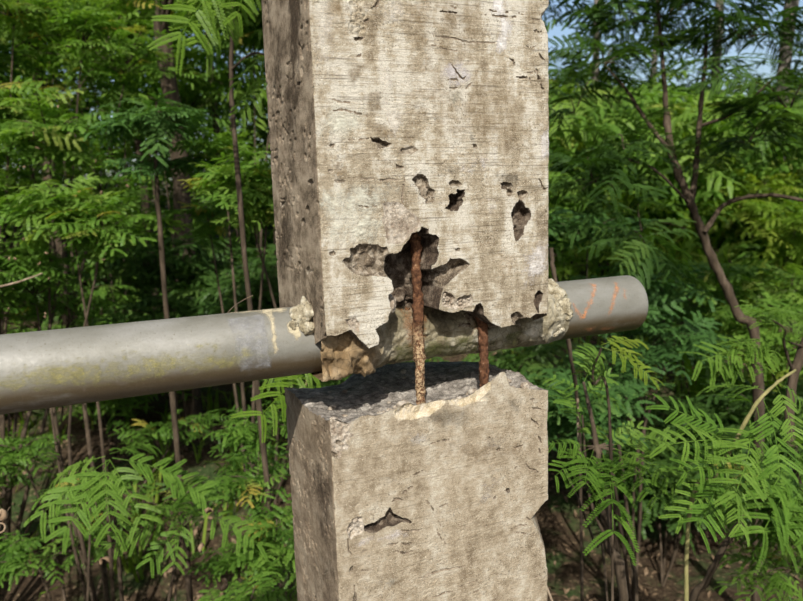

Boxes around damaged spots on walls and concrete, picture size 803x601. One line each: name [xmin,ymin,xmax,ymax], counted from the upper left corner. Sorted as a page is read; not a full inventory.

spalling [345,0,369,41]
spalling [412,174,435,203]
spalling [500,182,531,242]
spalling [329,201,470,348]
spalling [463,303,503,328]
spalling [533,290,544,314]
spalling [393,382,491,421]
spalling [330,419,354,459]
spalling [346,507,412,554]